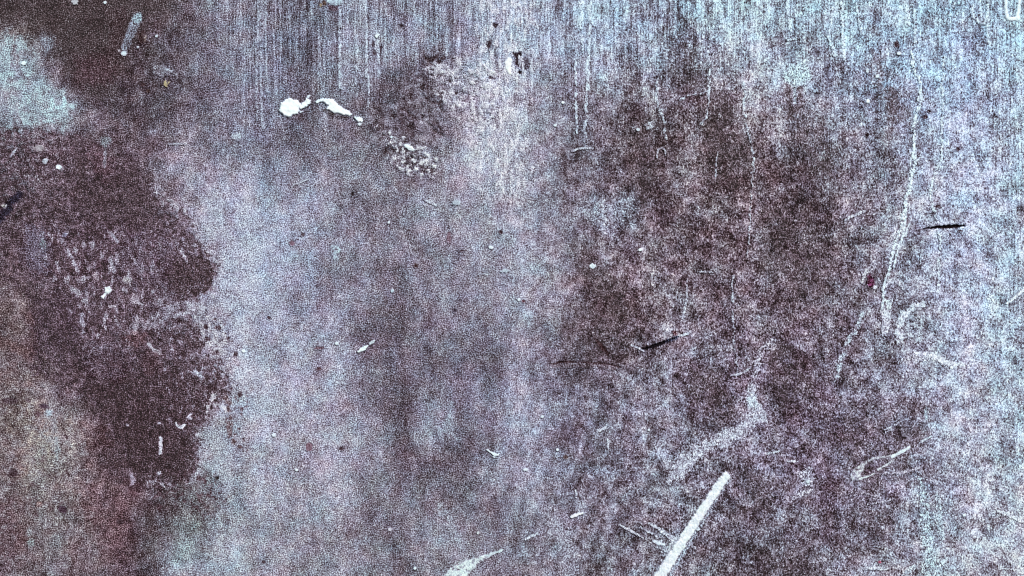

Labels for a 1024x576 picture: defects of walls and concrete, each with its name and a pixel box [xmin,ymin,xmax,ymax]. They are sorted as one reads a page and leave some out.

leakage [97,133,113,169]
leakage [780,61,814,124]
leakage [881,84,900,144]
leakage [572,167,651,242]
leakage [831,311,865,385]
leakage [879,299,973,369]
leakage [666,337,781,486]
leakage [0,351,104,576]
leakage [192,423,247,497]
leakage [791,465,817,501]
leakage [538,498,583,576]
leakage [903,471,948,576]